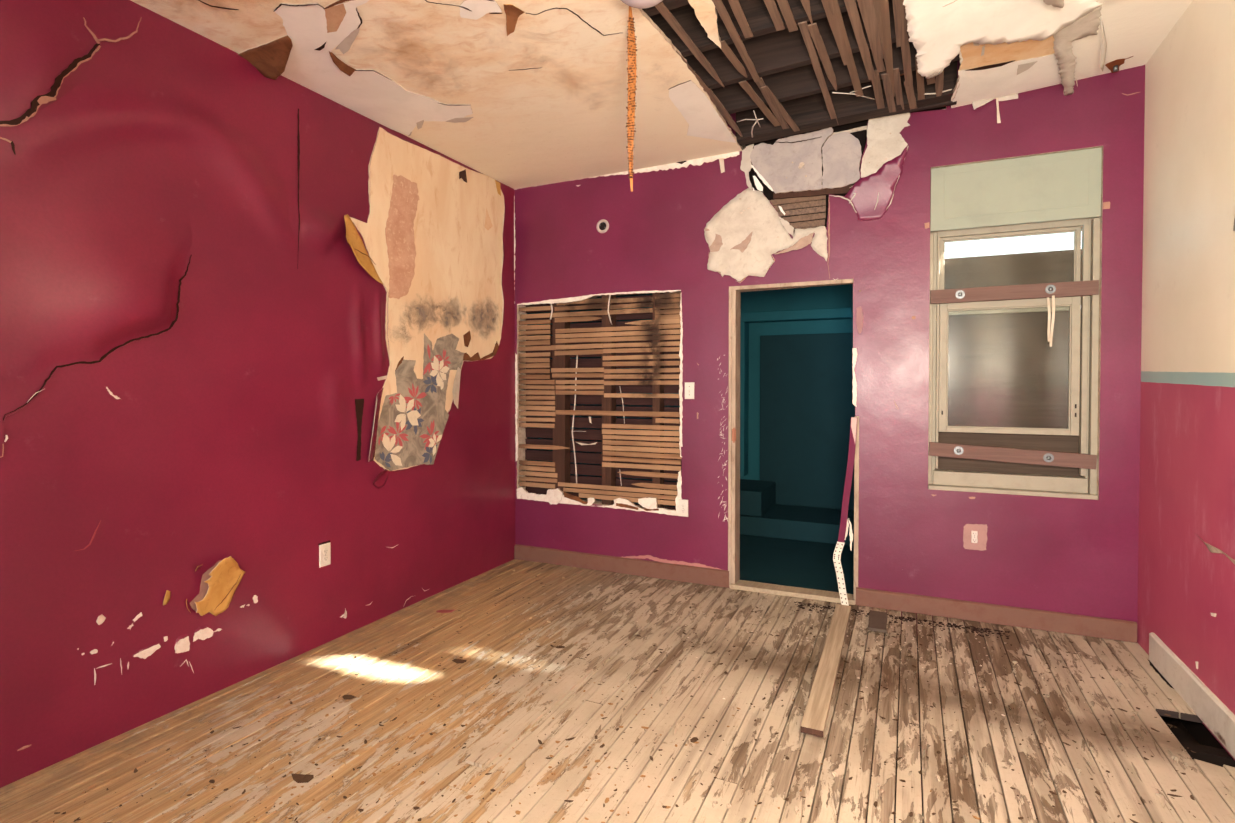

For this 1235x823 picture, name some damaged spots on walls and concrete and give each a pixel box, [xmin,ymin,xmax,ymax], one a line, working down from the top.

crack [0,17,142,155]
crack [526,8,619,36]
peeling [952,5,1102,110]
spalling [570,80,910,233]
spalling [238,0,699,516]
crack [3,255,193,422]
peeling [1197,535,1235,564]
spalling [77,626,222,685]